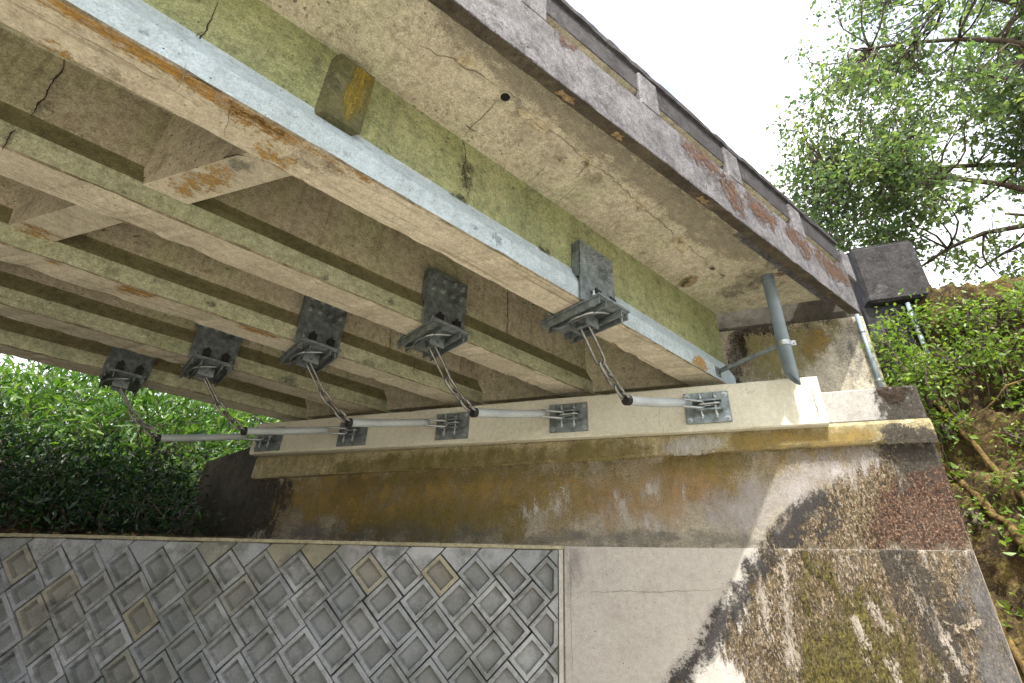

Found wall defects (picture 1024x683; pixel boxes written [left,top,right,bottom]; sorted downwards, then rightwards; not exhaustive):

crack [196,3,218,39]
crack [2,59,65,150]
rust [36,0,372,197]
rust [692,355,709,372]
leakage [260,427,893,583]
leakage [944,616,982,633]